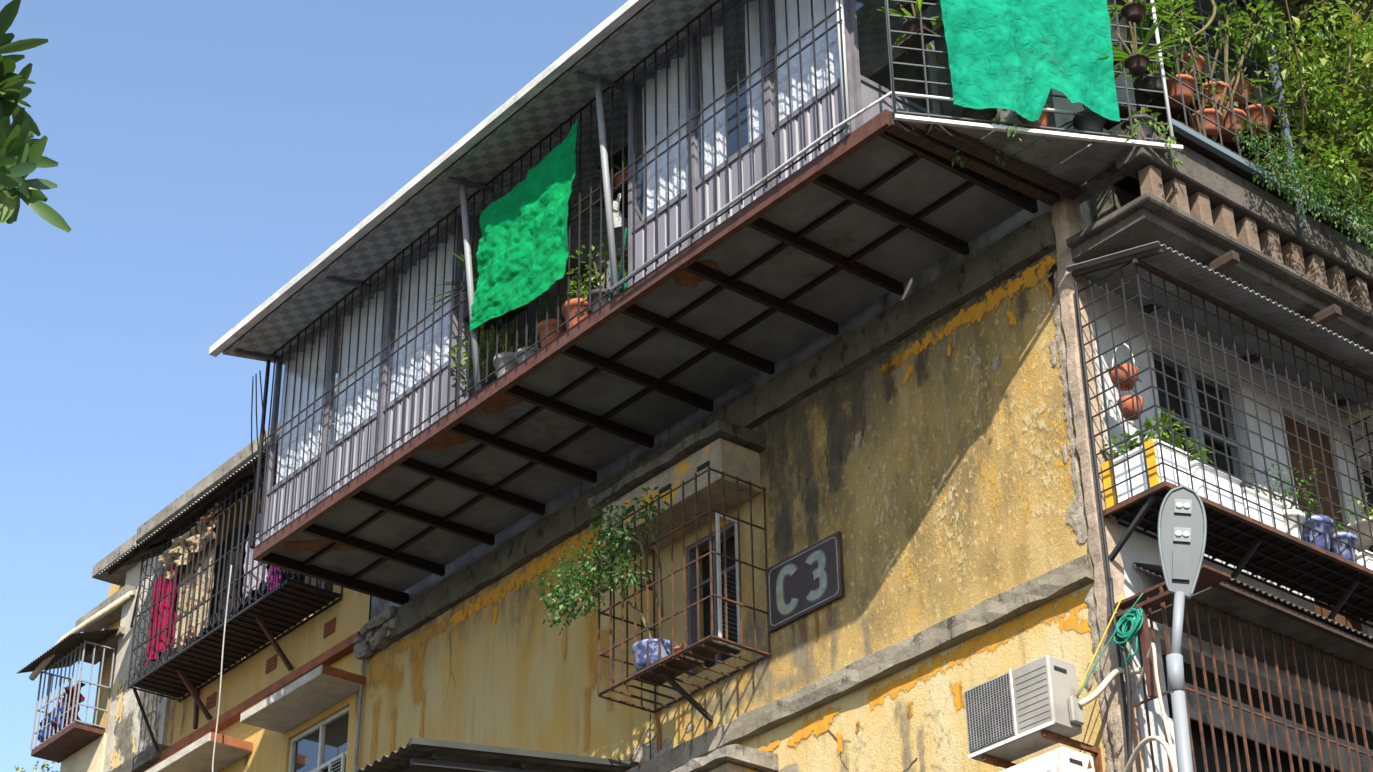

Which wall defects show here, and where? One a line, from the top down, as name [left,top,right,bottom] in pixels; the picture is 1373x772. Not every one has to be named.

damp [758,261,1048,577]
peeling [878,253,1089,543]
damp [1007,388,1072,532]
peeling [106,680,136,770]
peeling [758,587,1124,772]